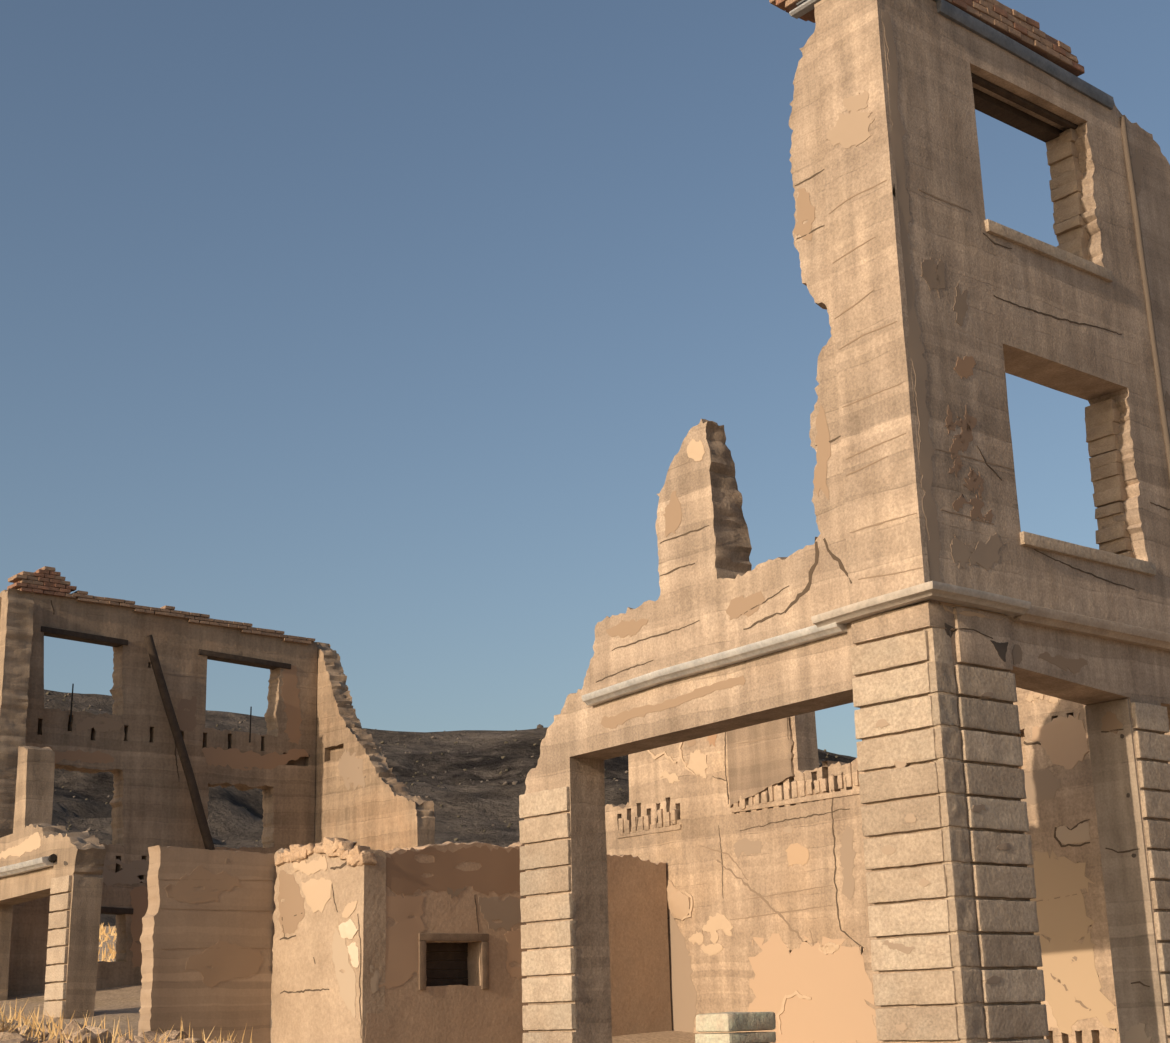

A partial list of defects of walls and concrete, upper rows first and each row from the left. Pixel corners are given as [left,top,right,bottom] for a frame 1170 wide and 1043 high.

crack [741,537,819,630]
crack [953,628,993,639]
spalling [647,739,708,784]
spalling [1025,692,1089,770]
crack [700,732,864,948]
crack [280,913,329,994]
crack [330,861,362,1038]
spalling [1044,999,1059,1029]